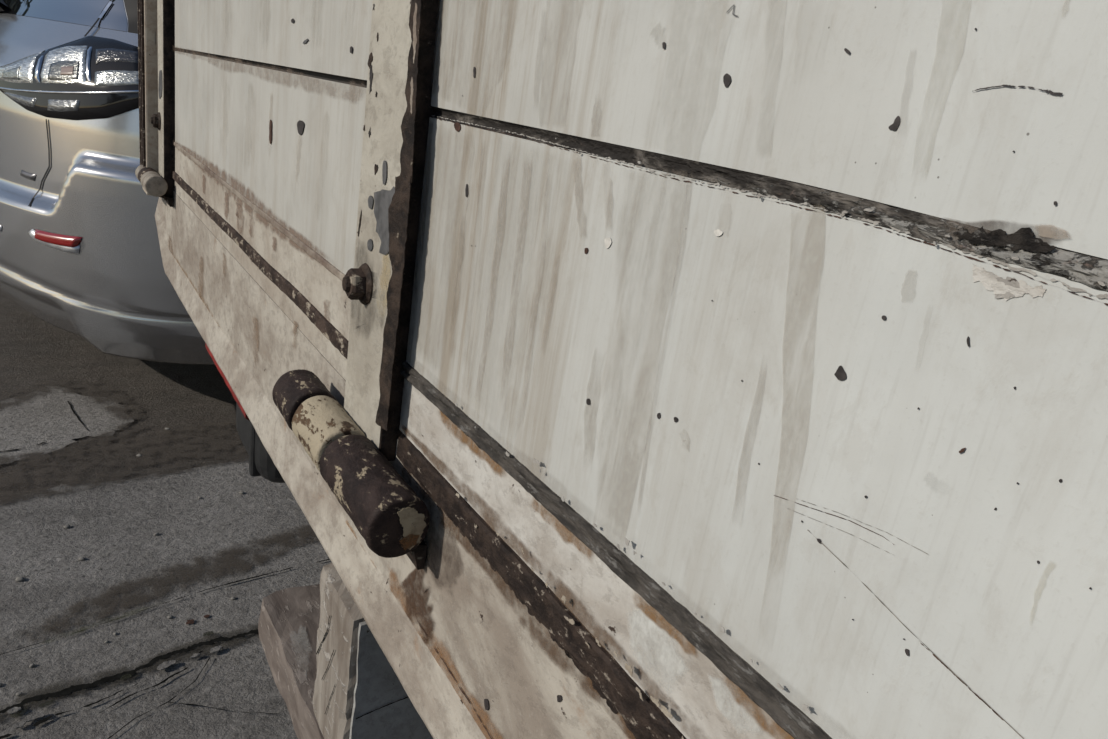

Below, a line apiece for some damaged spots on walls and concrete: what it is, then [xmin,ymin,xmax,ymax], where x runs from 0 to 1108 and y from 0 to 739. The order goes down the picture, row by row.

peeling [358,0,422,431]
spalling [952,226,1056,253]
peeling [986,271,1020,299]
rust [440,411,502,474]
rust [403,426,532,562]
rust [402,467,572,670]
crack [0,629,259,739]
rust [391,569,501,739]
rust [549,573,621,656]
rust [580,675,600,699]
rust [640,603,695,653]